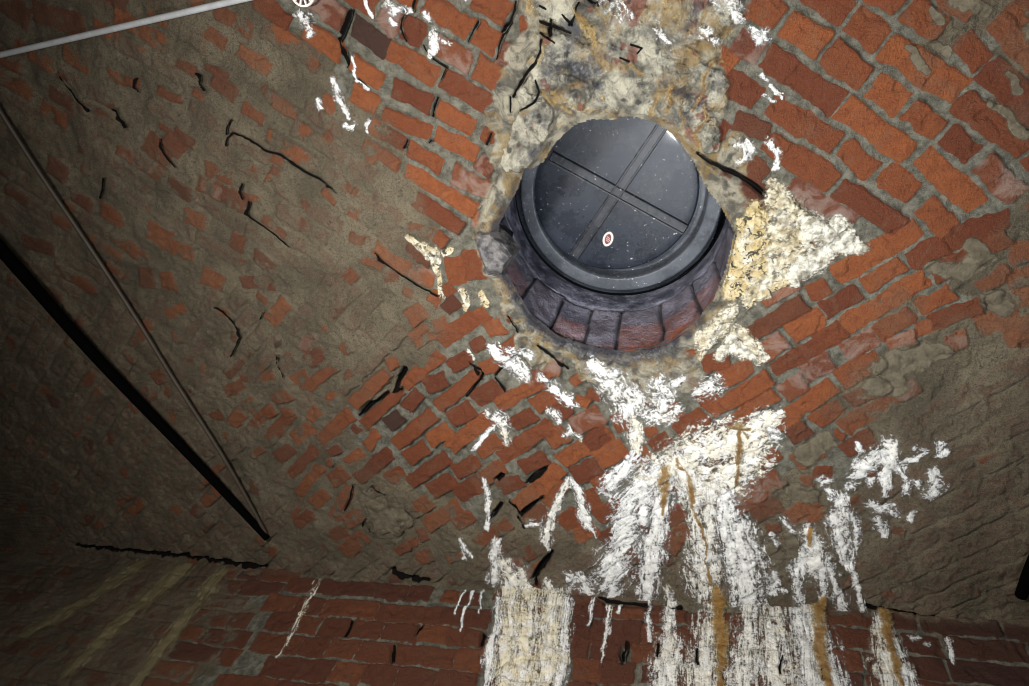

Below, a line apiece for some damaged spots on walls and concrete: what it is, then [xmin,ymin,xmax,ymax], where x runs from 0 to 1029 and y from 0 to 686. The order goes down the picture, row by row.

crack [468,0,610,111]
spalling [500,0,743,173]
crack [619,43,643,63]
damp [759,72,784,103]
crack [225,119,335,193]
damp [405,234,454,300]
spalling [476,227,521,275]
damp [454,137,951,686]
rust [729,422,751,487]
rust [657,458,729,686]
flaking render [755,532,801,566]
rust [811,596,833,686]